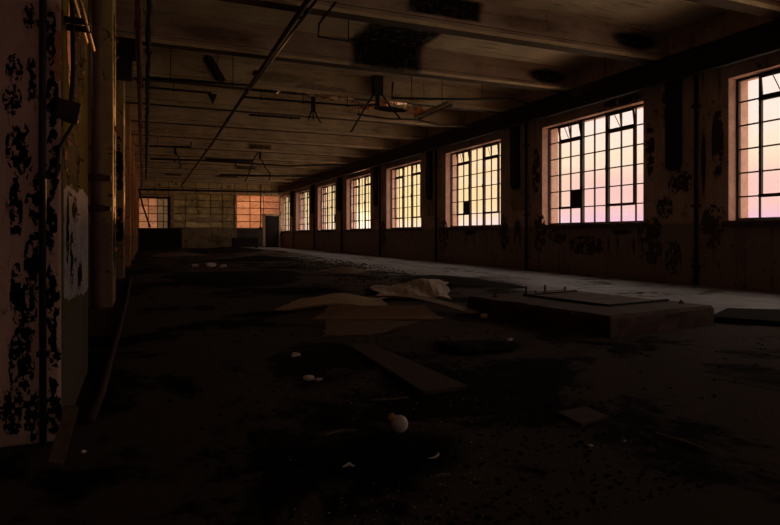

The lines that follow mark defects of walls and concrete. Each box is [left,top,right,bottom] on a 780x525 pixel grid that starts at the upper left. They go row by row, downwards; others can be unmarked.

peeling [0,0,87,442]
peeling [641,170,692,265]